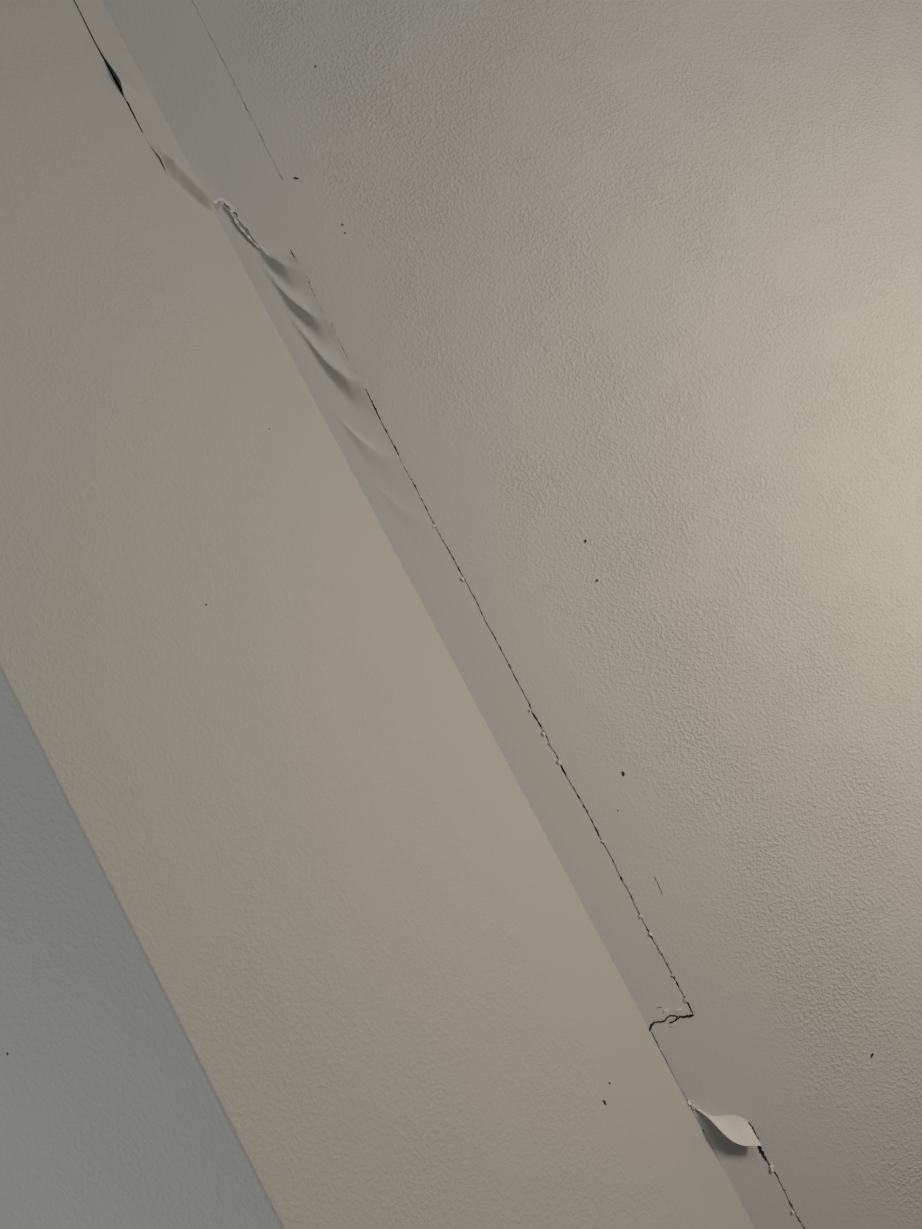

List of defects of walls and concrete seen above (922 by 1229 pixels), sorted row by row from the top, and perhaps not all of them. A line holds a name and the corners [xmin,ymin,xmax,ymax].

crack [73,0,143,133]
crack [365,389,718,1159]
crack [749,1123,805,1229]